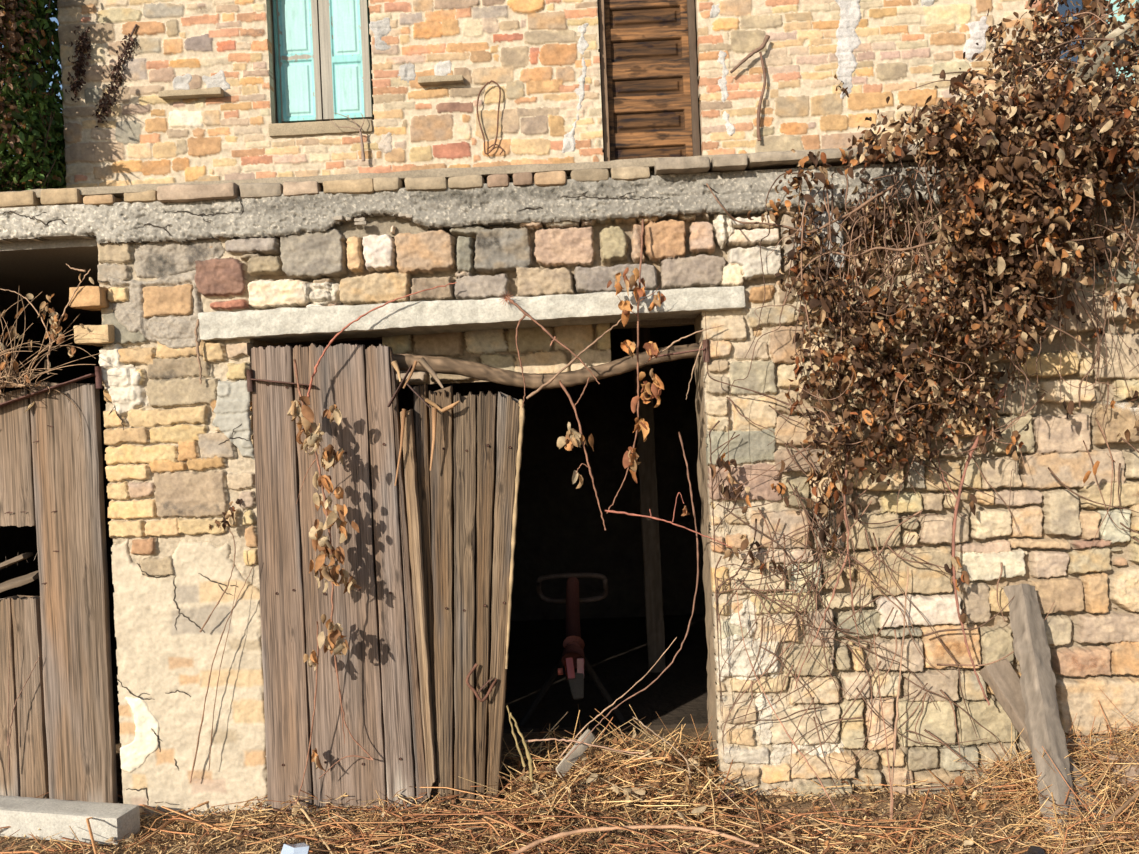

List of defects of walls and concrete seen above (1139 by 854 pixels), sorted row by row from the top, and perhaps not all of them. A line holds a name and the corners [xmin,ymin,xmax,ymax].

crack [137,563,238,633]